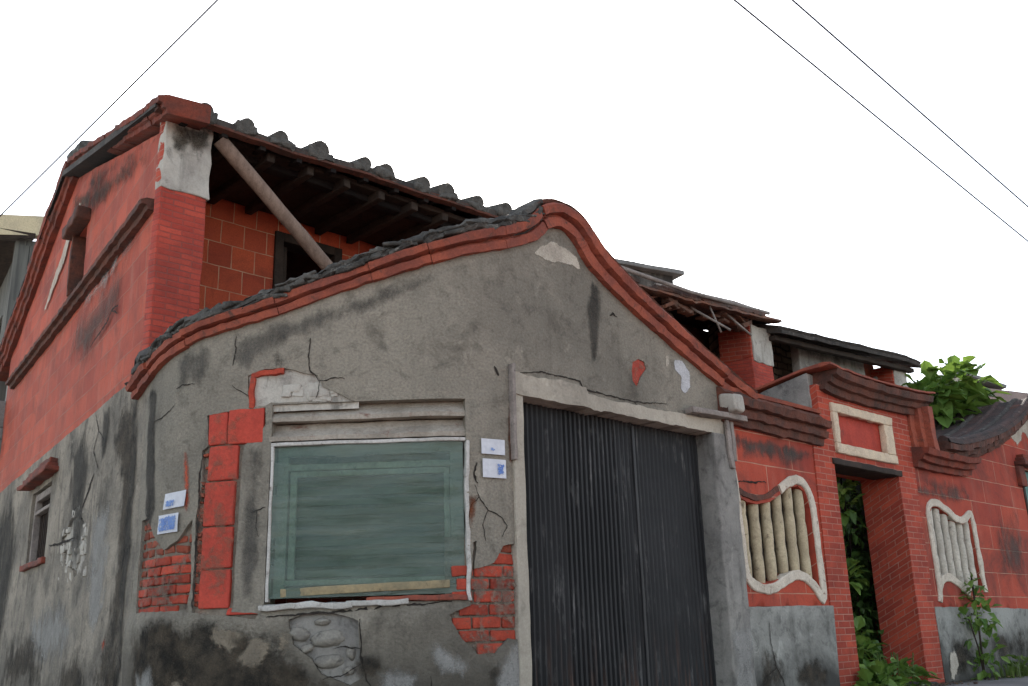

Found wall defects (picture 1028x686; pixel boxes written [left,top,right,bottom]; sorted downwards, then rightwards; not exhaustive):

water stain [75,161,134,213]
water stain [44,240,69,310]
water stain [588,283,599,358]
crack [308,338,344,398]
crack [494,366,667,405]
flaking render [632,359,645,386]
flaking render [58,509,88,583]
water stain [69,389,156,686]
flaking render [137,368,359,619]
crack [469,462,508,540]
flaking render [445,537,516,656]
flaking render [290,613,364,685]